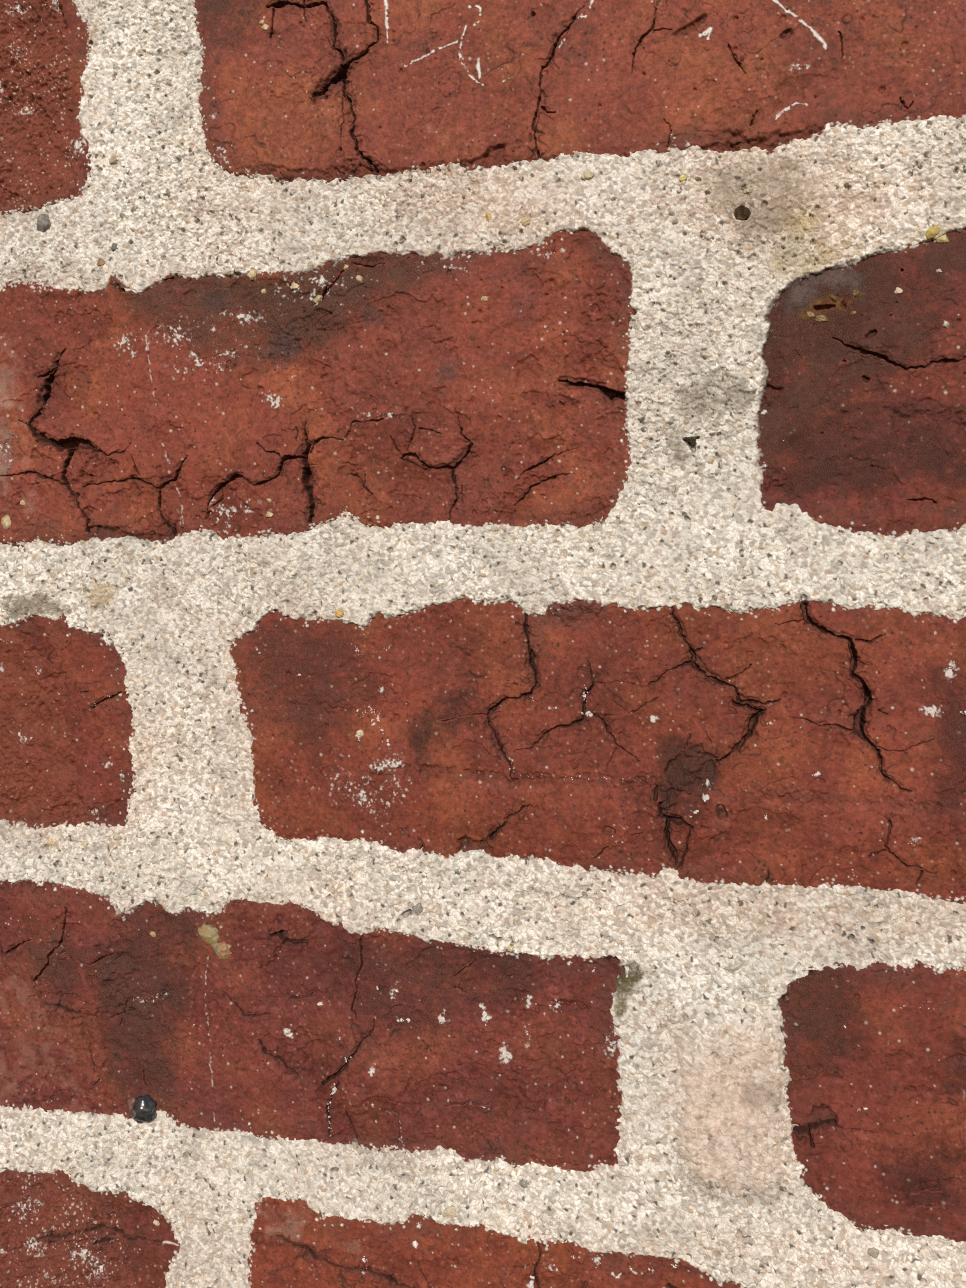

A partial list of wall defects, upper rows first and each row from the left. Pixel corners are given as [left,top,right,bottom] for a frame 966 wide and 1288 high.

crack [263,0,381,175]
crack [530,3,587,160]
crack [628,0,674,76]
crack [661,117,674,149]
crack [725,41,749,76]
crack [747,108,761,128]
crack [555,377,627,403]
crack [0,345,475,539]
crack [512,445,581,509]
crack [437,599,940,911]
crack [275,1233,434,1288]
crack [510,1241,544,1288]